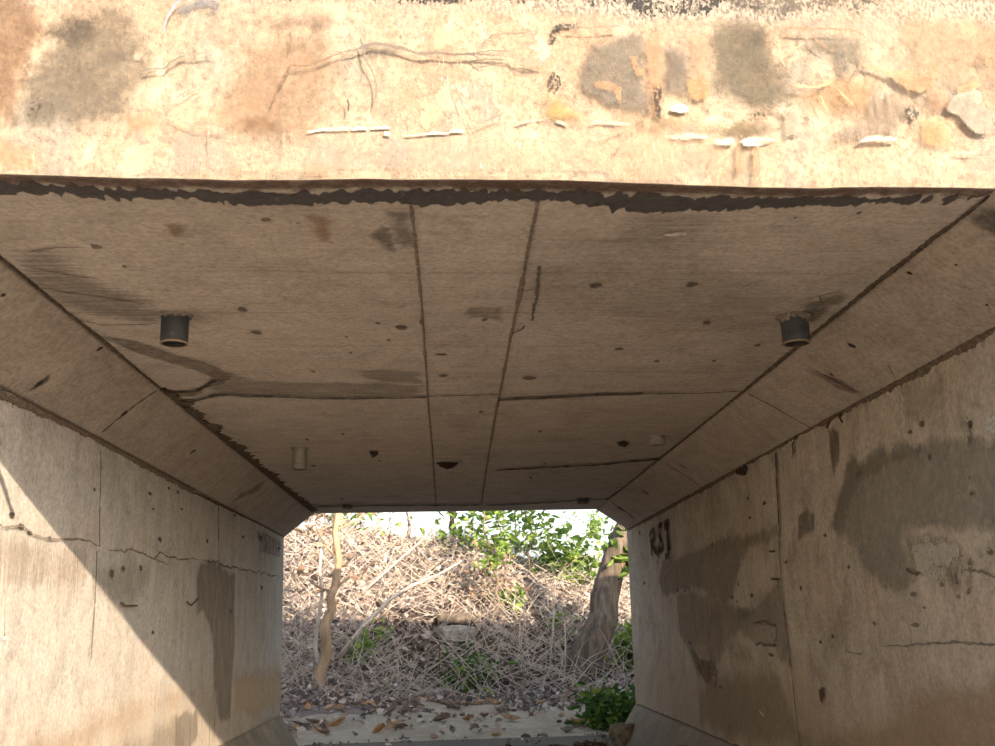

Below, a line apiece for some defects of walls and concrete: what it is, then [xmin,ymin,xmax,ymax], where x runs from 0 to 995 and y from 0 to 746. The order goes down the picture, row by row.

leakage [29,14,143,120]
crack [270,22,531,109]
leakage [716,22,802,136]
leakage [670,133,774,146]
leakage [0,175,994,198]
leakage [828,429,838,474]
crack [0,524,280,578]
leakage [798,510,814,540]
leakage [835,417,995,588]
leakage [197,559,235,746]
crack [889,640,995,661]